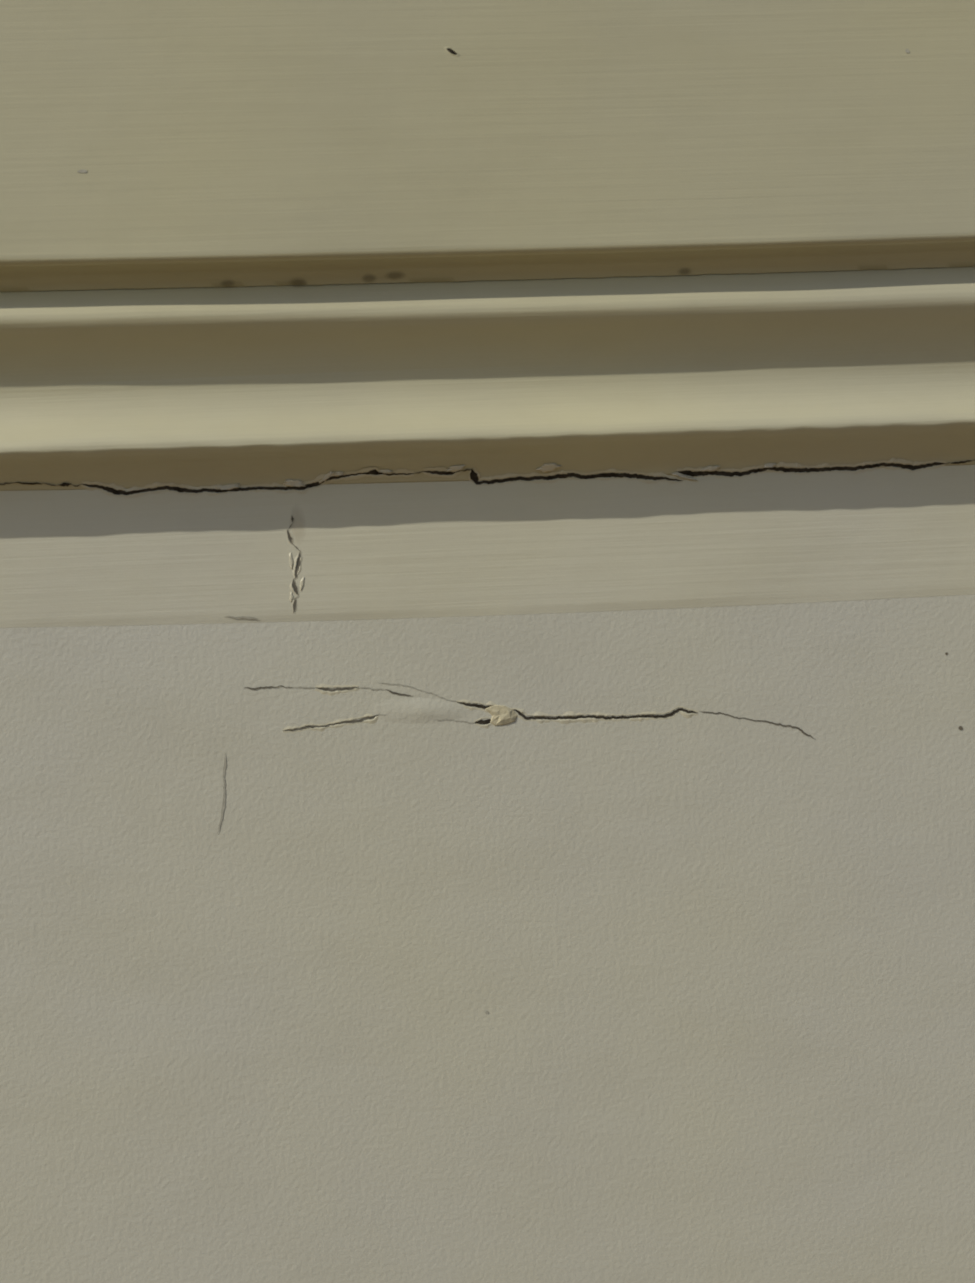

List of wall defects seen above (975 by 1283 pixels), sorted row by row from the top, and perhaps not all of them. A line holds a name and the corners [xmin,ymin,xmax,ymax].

crack [0,458,974,613]
crack [244,683,814,739]